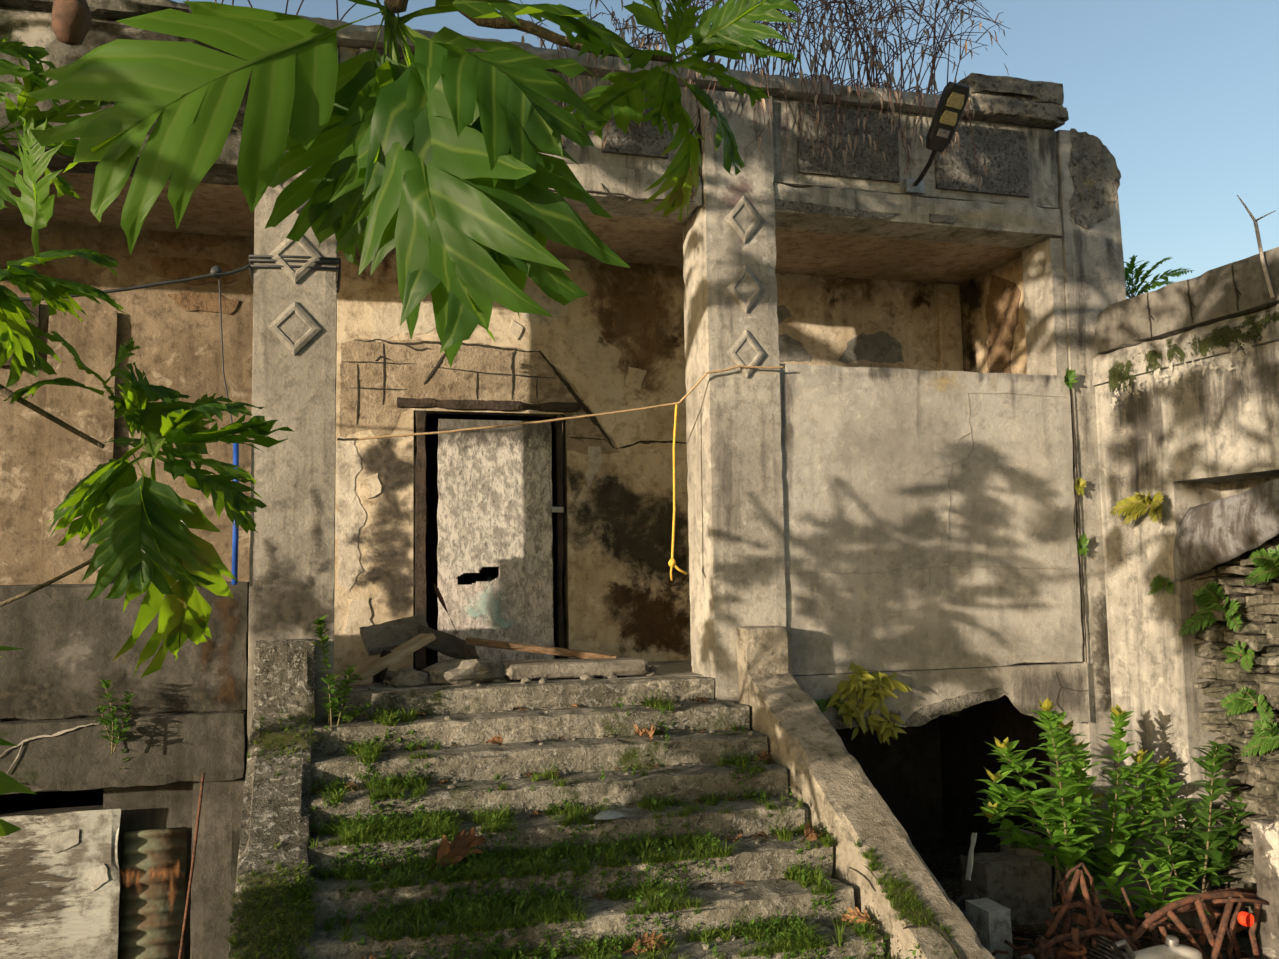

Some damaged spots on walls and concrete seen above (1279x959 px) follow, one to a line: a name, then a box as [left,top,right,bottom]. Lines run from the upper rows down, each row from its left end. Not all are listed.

spalling [1068,128,1121,230]
water stain [589,261,685,390]
crack [357,339,687,449]
water stain [1199,337,1279,418]
water stain [252,542,334,639]
water stain [349,438,416,616]
water stain [564,467,691,656]
crack [787,390,1089,718]
spalling [828,687,1008,729]
water stain [0,843,74,926]
rust [126,863,179,906]